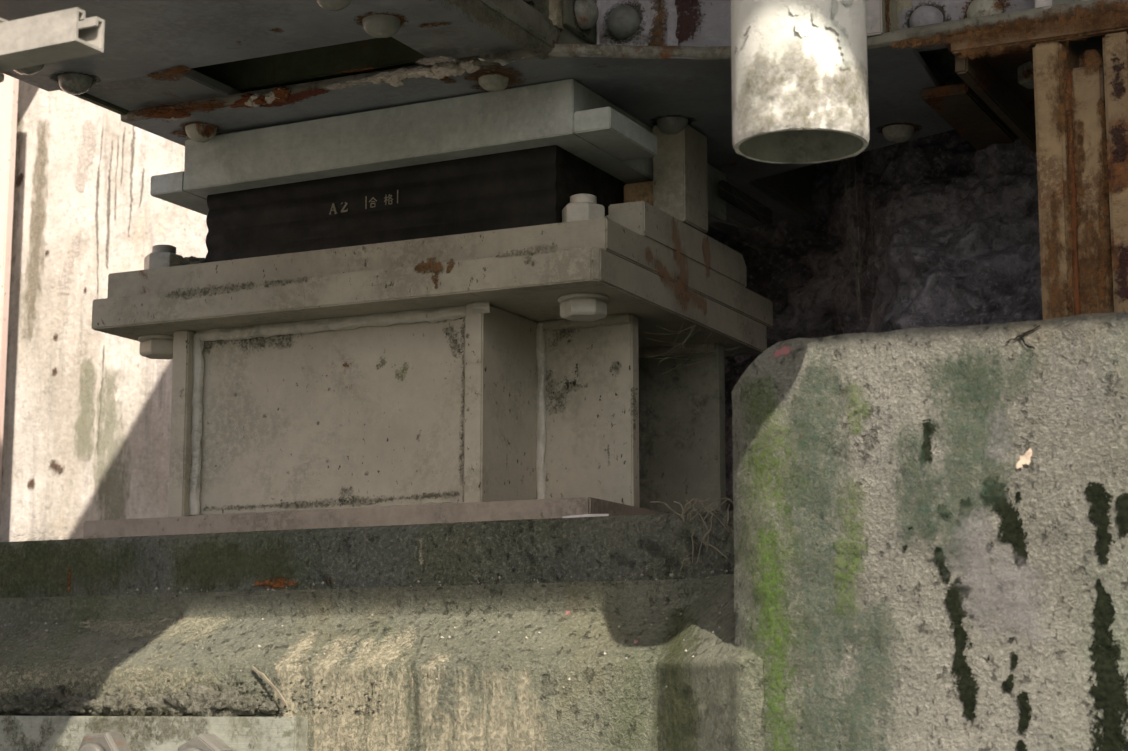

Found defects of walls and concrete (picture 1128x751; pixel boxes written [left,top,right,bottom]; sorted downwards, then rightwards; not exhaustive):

damp [10,120,47,338]
damp [75,118,144,296]
rust [134,88,328,137]
rust [414,258,455,288]
rust [648,0,705,46]
peeling [789,0,854,70]
rust [885,0,1128,318]
damp [75,359,129,520]
damp [895,350,1032,719]
damp [1084,482,1128,564]
damp [1002,637,1032,751]
damp [1087,579,1128,751]